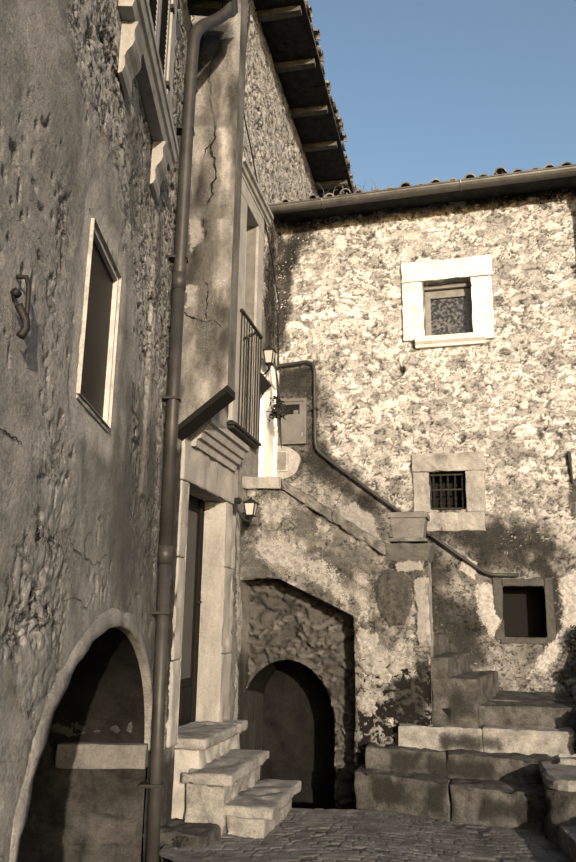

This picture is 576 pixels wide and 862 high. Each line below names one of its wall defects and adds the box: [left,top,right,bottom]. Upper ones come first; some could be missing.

crack [184,59,221,328]